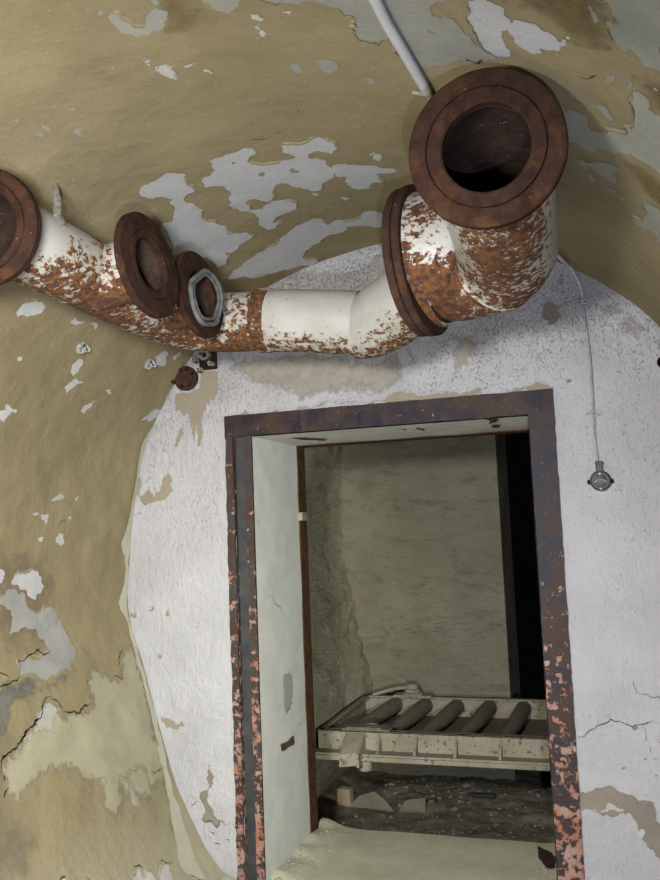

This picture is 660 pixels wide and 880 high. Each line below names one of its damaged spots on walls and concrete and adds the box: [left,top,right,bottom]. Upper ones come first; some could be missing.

peeling [588,0,660,71]
peeling [562,78,660,201]
peeling [139,137,397,279]
peeling [630,199,660,242]
peeling [65,359,83,393]
peeling [0,370,221,880]
crack [0,649,50,687]
crack [1,697,90,799]
crack [581,719,656,760]
spalling [579,783,660,859]